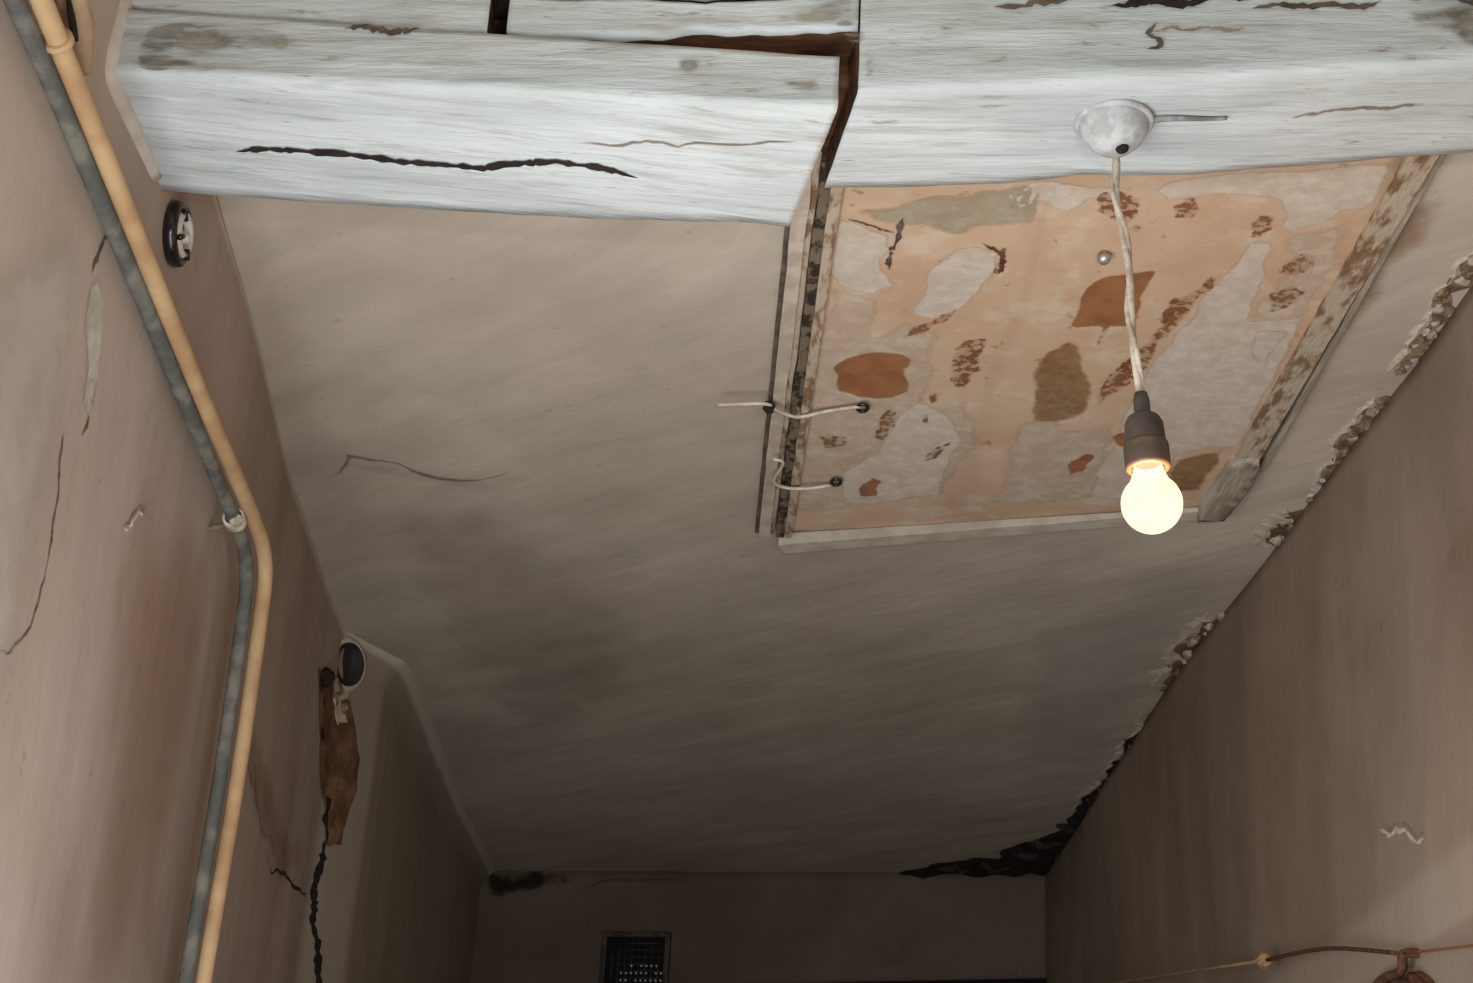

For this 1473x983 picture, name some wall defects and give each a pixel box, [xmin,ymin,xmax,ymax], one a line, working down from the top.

peeling [85,282,103,414]
peeling [797,182,1129,511]
peeling [996,164,1388,504]
flaking render [1386,252,1473,376]
crack [0,376,99,654]
flaking render [1252,395,1391,548]
flaking render [1149,612,1224,691]
crack [248,764,327,983]
flaking render [489,871,551,895]
flaking render [899,711,1151,879]